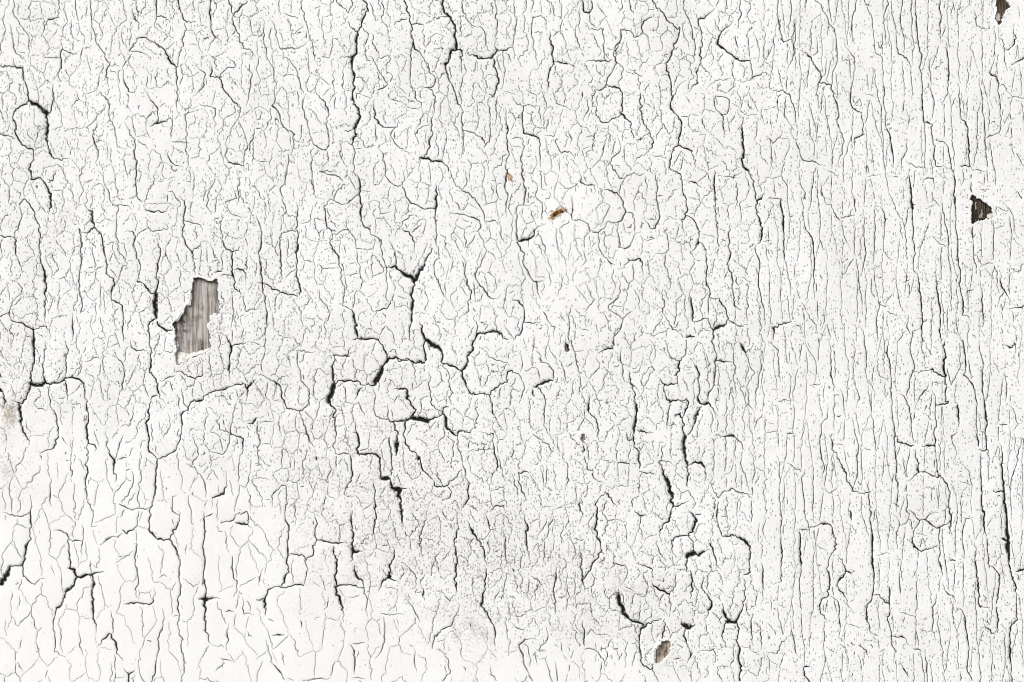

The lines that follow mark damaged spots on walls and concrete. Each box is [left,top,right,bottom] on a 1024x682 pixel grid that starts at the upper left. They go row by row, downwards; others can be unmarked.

peeling [995,0,1011,25]
peeling [970,195,992,224]
peeling [172,277,221,365]
crack [775,458,788,591]
crack [95,592,171,682]
crack [389,589,481,681]
crack [508,618,560,682]
crack [572,614,613,681]
peeling [654,641,671,664]
crack [802,627,815,682]
crack [913,632,937,682]
crack [923,585,951,682]